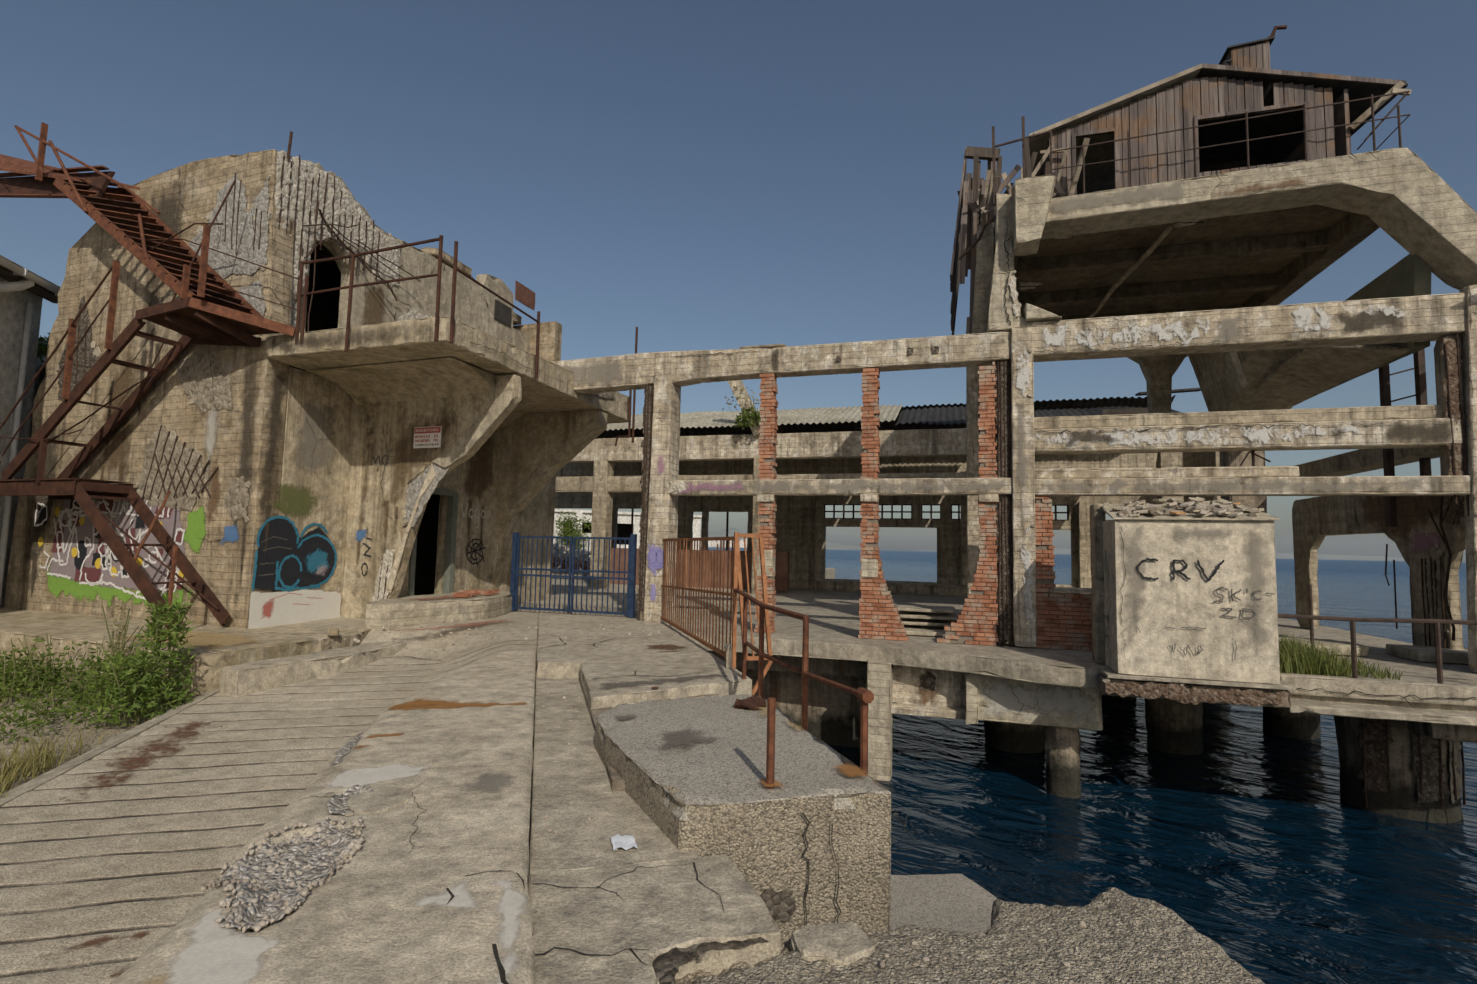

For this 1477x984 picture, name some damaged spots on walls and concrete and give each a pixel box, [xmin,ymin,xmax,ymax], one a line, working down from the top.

spalling [188,131,433,332]
rust [209,460,220,522]
rust [390,699,527,710]
rust [837,764,867,777]
spalling [200,784,374,932]
crack [465,862,725,913]